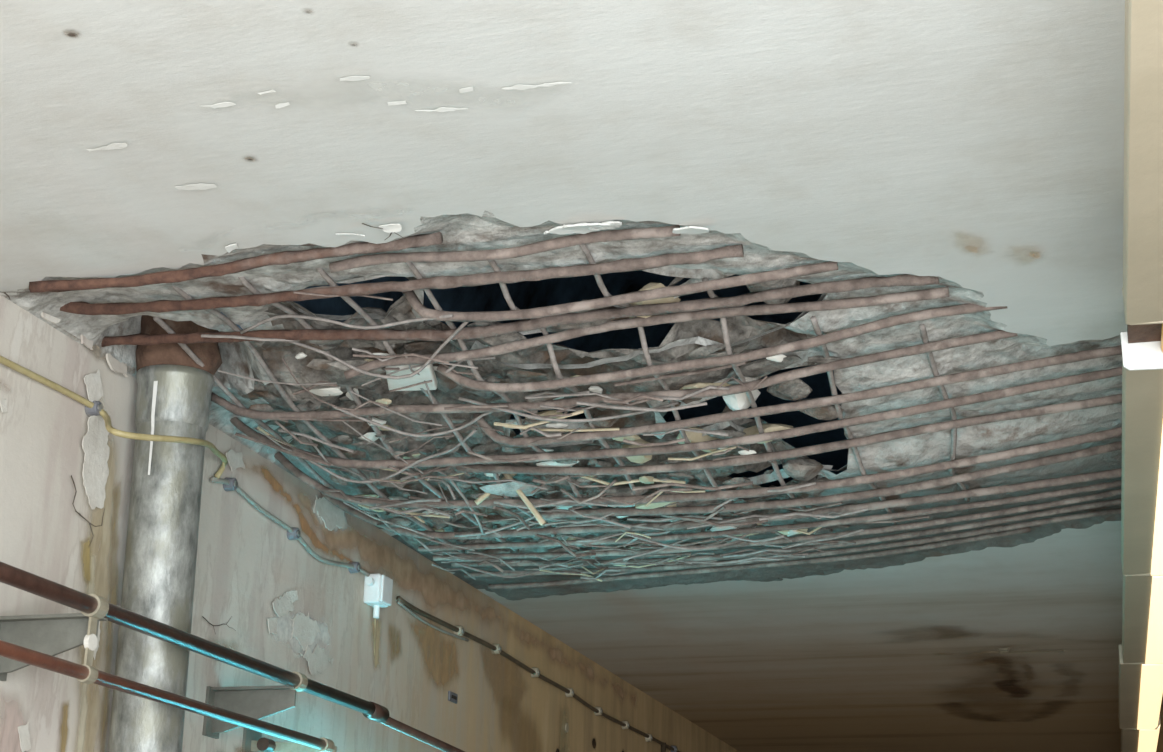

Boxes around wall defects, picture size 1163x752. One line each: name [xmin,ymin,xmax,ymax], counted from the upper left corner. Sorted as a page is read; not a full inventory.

spalling [2,211,1122,601]
peeling [0,702,31,752]